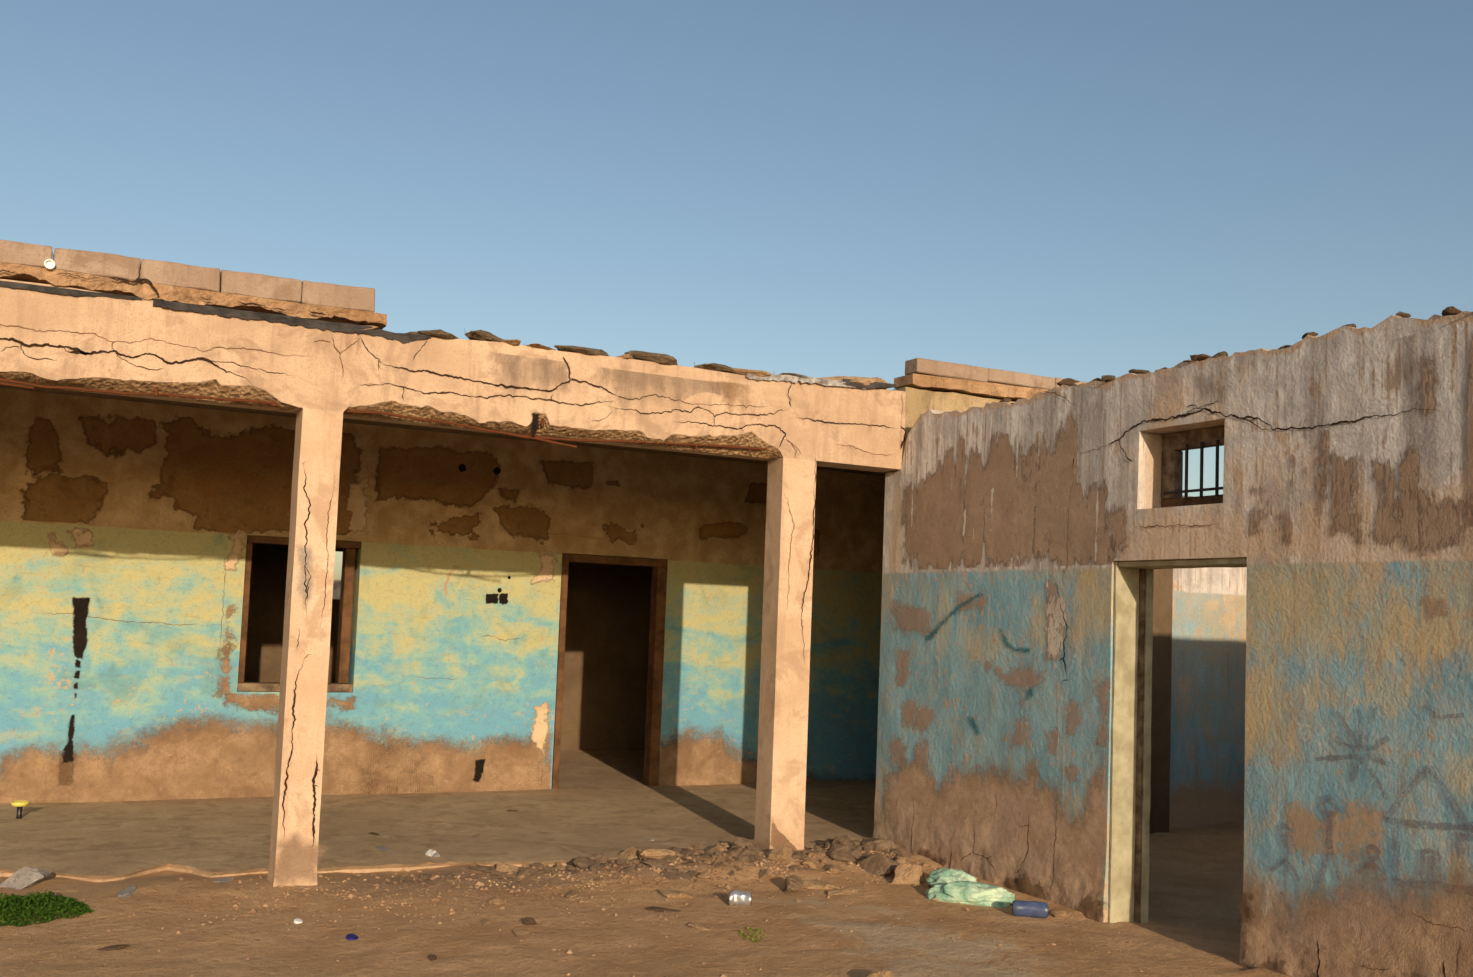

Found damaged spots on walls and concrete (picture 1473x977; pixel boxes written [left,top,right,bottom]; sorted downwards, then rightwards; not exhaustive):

crack [57,273,159,295]
flaking render [0,372,296,573]
crack [0,297,899,654]
spalling [336,401,782,585]
crack [1057,401,1432,681]
flaking render [1248,339,1473,556]
crack [282,466,335,837]
flaking render [873,409,1127,922]
crack [1412,912,1469,977]